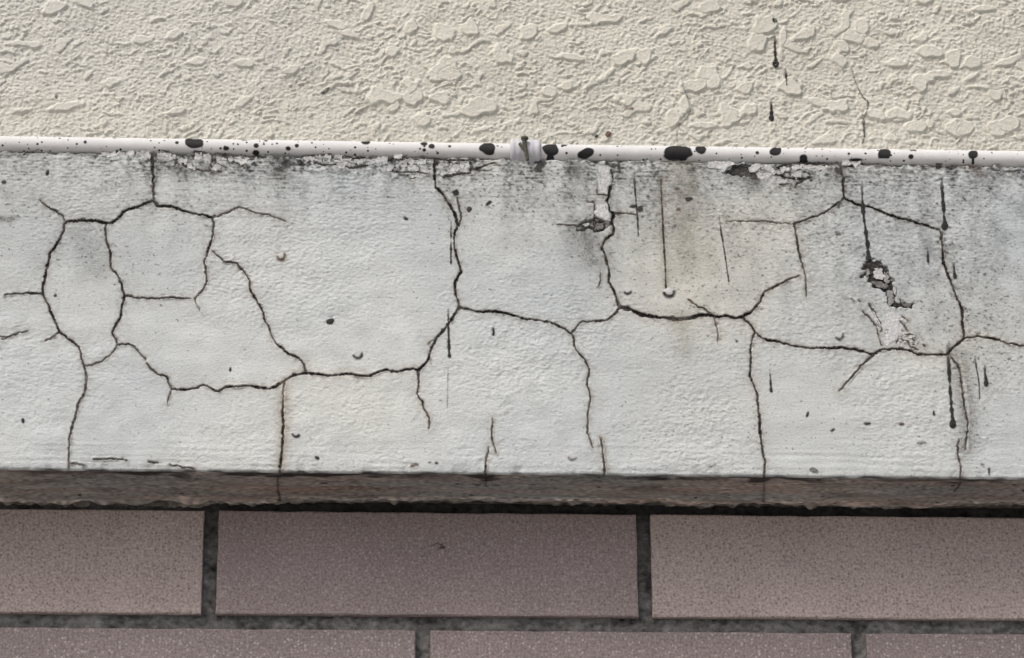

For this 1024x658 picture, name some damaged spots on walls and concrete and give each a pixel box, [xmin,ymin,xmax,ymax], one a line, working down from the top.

water stain [542,144,566,161]
water stain [575,148,594,174]
water stain [664,146,706,161]
spalling [707,160,897,185]
water stain [878,149,891,158]
water stain [940,184,948,230]
water stain [861,190,871,261]
crack [0,152,1024,478]
spalling [860,261,925,350]